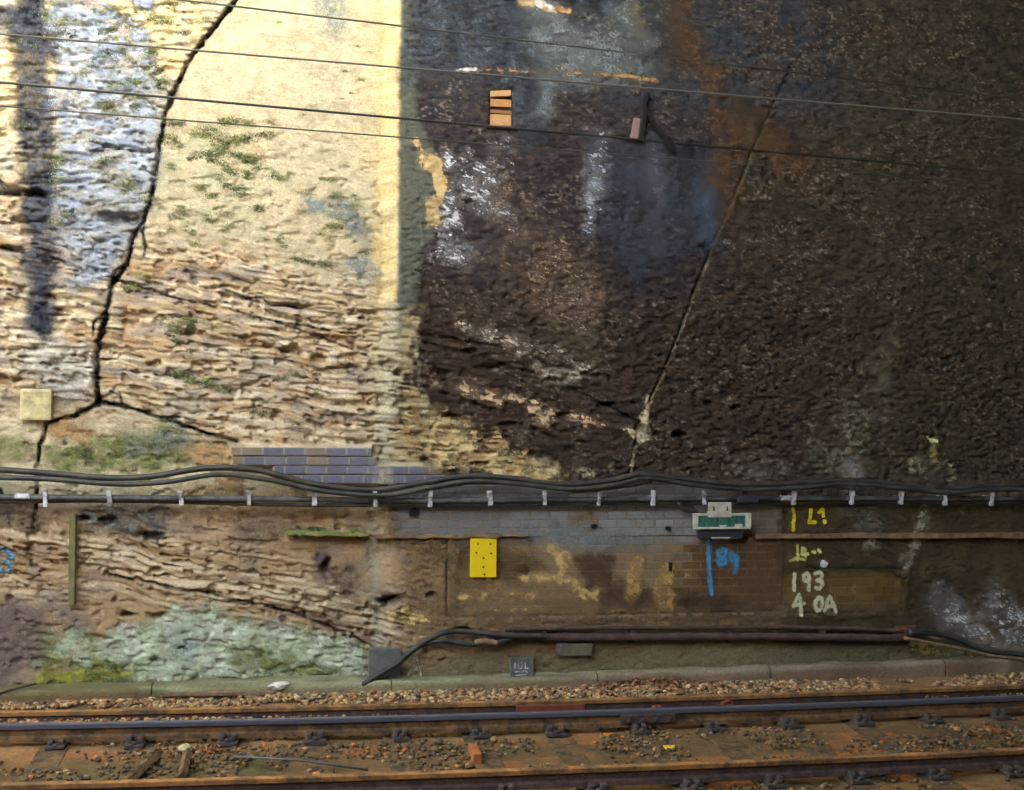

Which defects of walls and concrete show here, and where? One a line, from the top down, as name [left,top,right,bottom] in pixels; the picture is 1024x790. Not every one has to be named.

crack [0,246,82,269]
crack [34,0,366,531]
leakage [435,149,609,383]
leakage [159,605,221,664]
leakage [232,648,333,676]
leakage [934,593,1024,648]